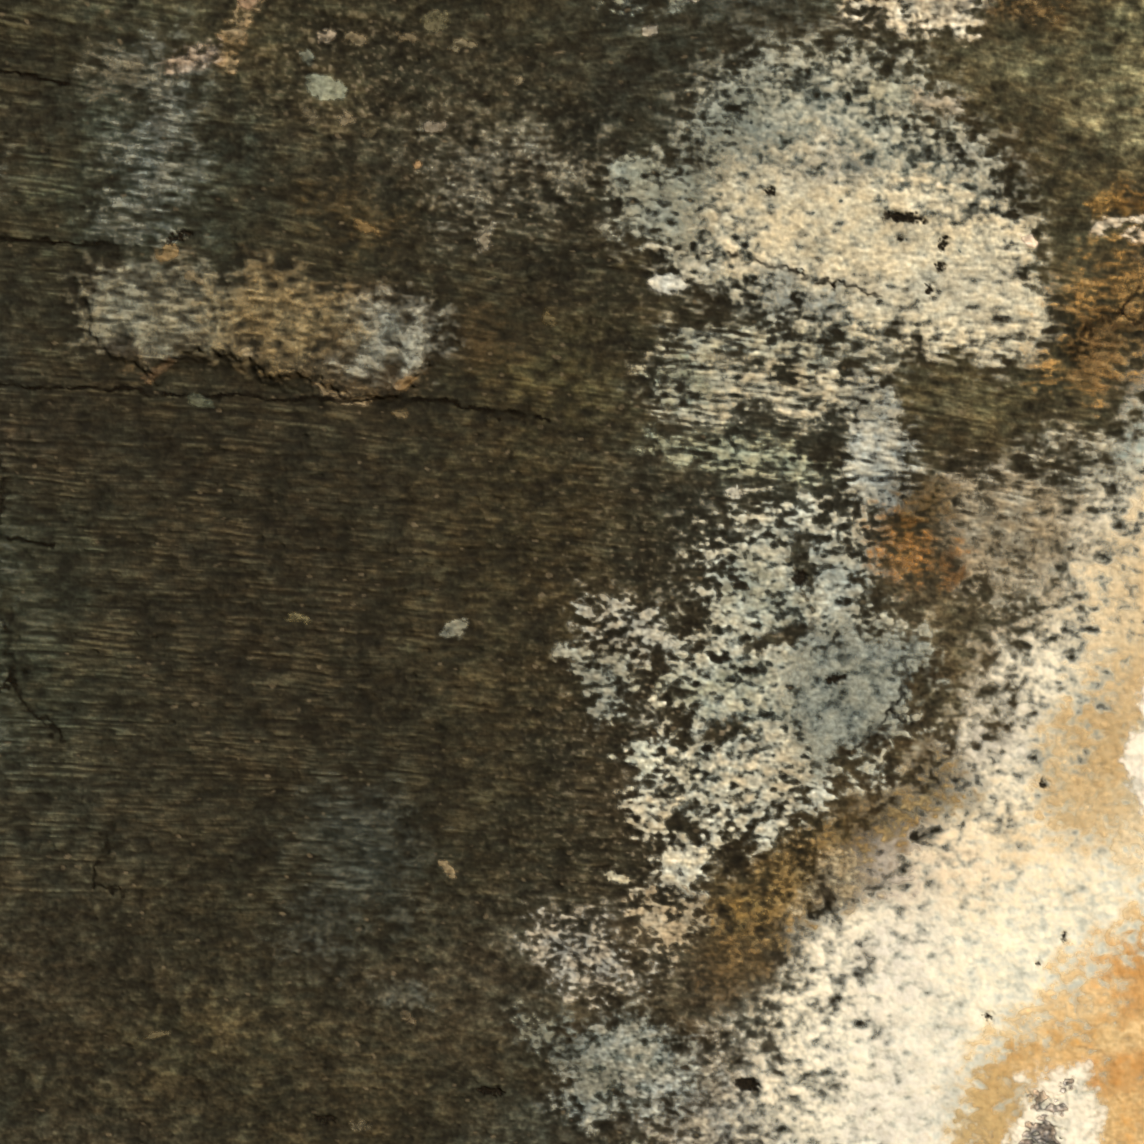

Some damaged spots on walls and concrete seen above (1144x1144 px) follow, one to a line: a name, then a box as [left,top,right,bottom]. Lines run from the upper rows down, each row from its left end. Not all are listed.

water stain [839,0,998,42]
water stain [443,119,583,240]
water stain [553,31,1050,967]
crack [0,623,64,743]
water stain [931,462,1144,864]
water stain [944,902,1144,1144]